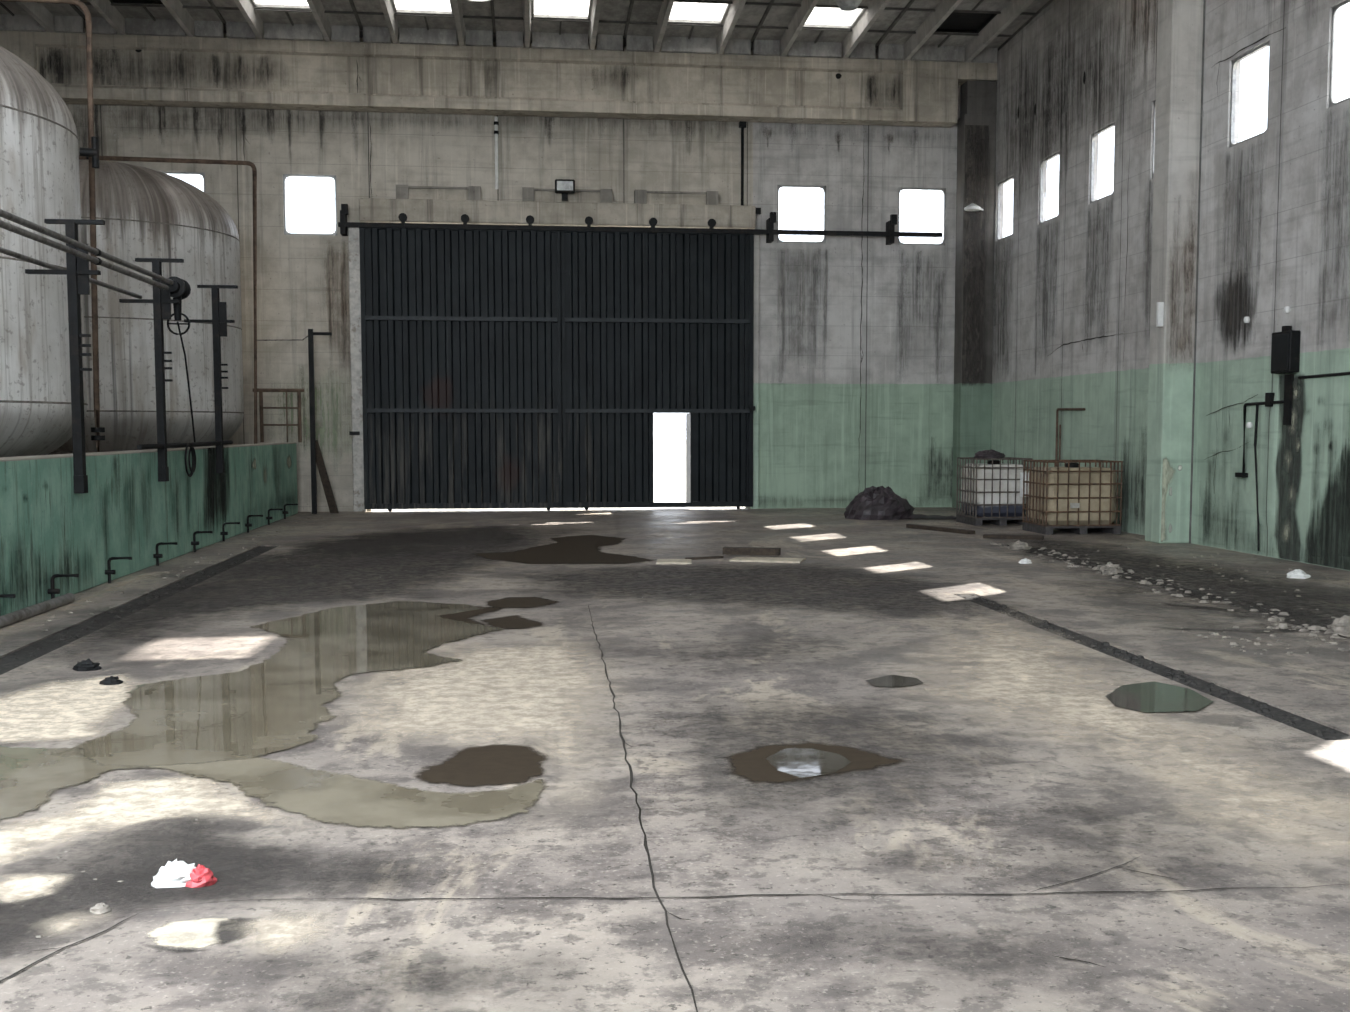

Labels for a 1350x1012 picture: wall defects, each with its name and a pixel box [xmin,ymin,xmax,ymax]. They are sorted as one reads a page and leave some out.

water stain [1305,444,1350,570]
crack [335,605,1225,1012]